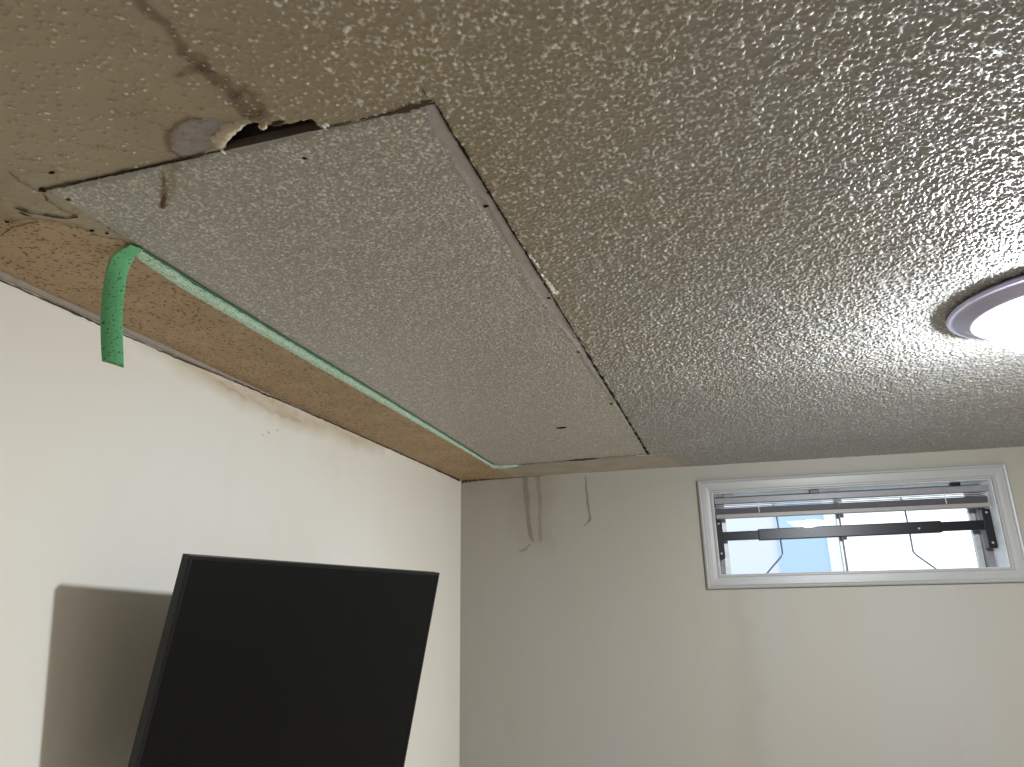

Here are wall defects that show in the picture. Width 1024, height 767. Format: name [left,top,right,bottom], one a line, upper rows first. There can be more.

peeling [165,118,234,157]
peeling [258,120,286,130]
water stain [0,217,129,316]
water stain [123,257,682,541]